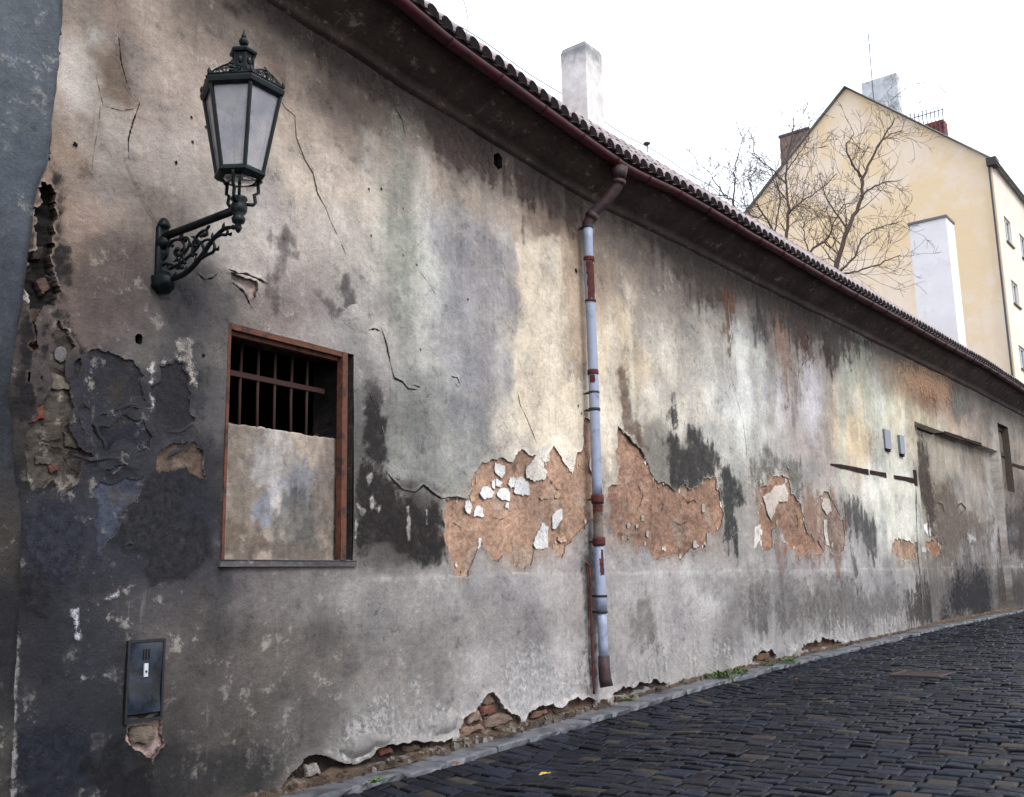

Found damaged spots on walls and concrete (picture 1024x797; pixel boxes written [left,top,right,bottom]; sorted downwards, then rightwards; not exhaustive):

crack [92,2,157,226]
crack [281,100,347,259]
spalling [13,153,214,570]
crack [368,325,421,390]
peeling [355,496,380,539]
peeling [426,404,726,585]
peeling [754,468,848,566]
peeling [889,523,946,569]
spalling [748,629,848,668]
spalling [116,705,173,776]
spalling [270,672,672,791]